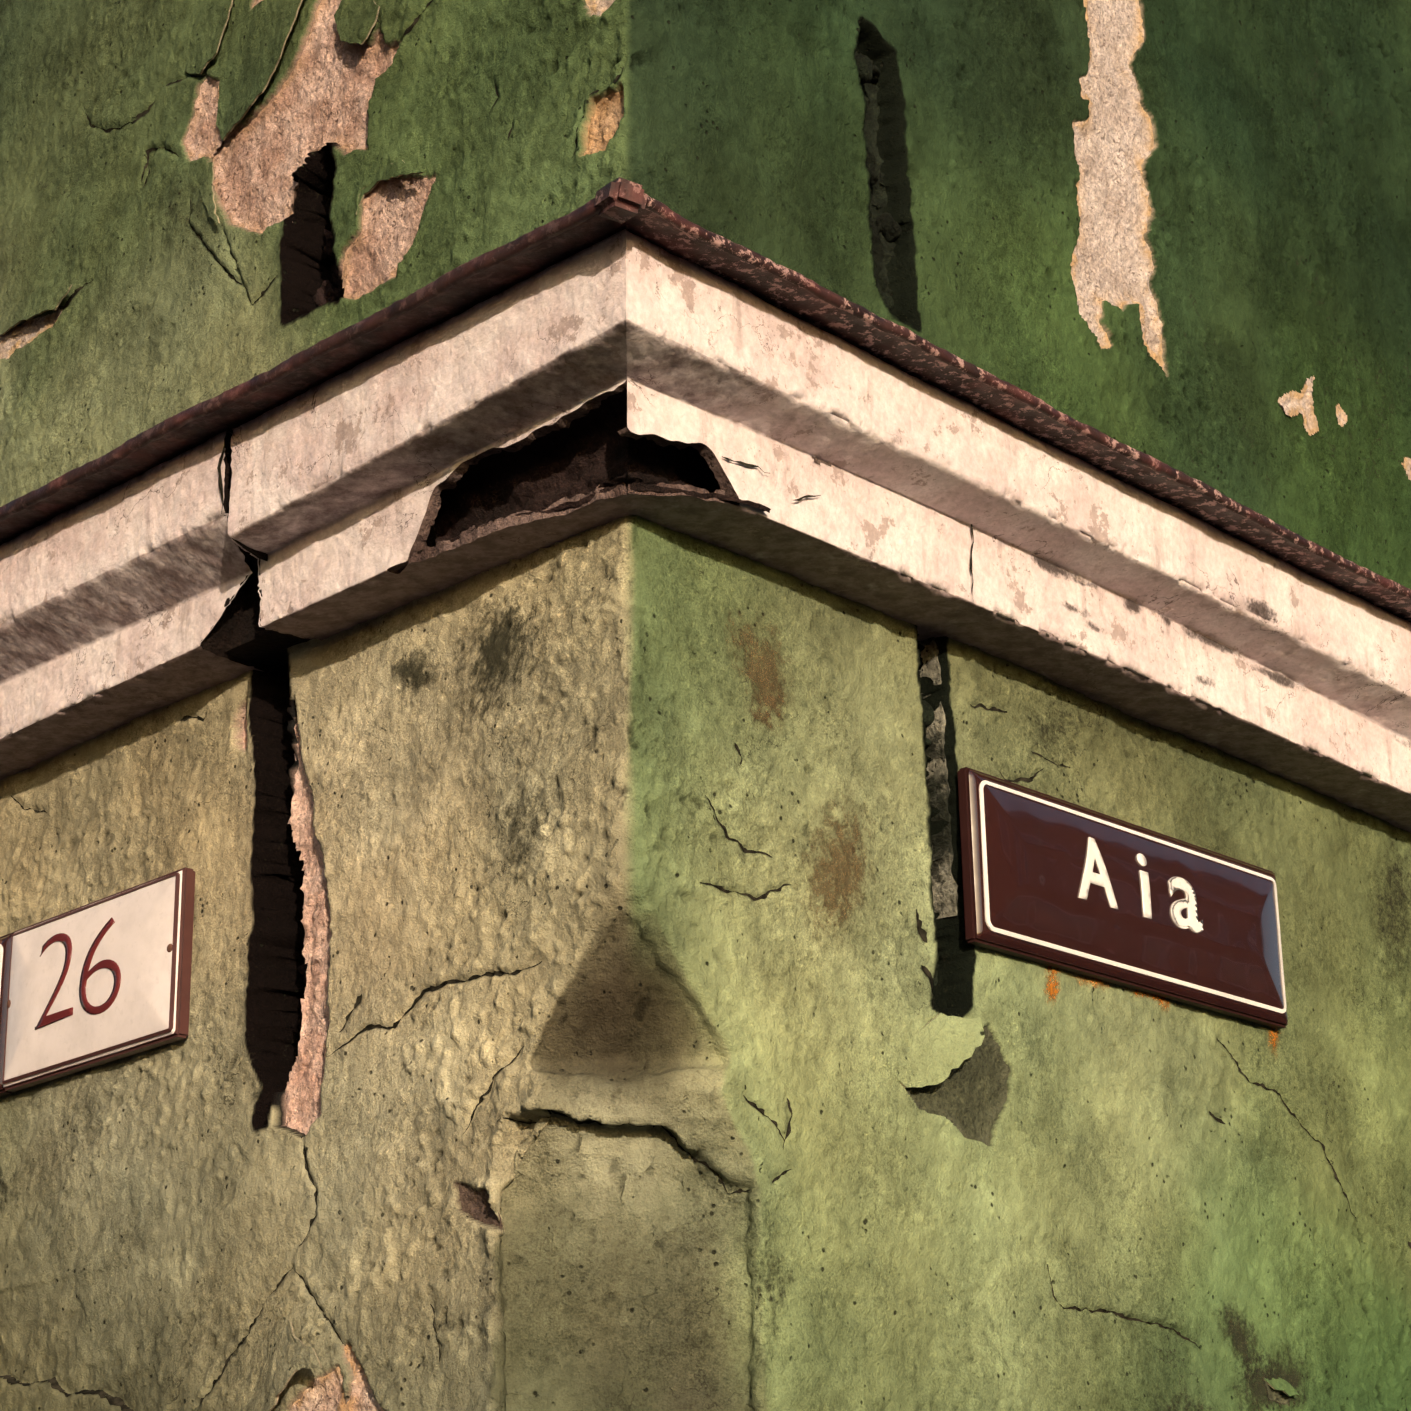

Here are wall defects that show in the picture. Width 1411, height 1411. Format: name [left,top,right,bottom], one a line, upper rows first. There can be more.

peeling [0,280,93,359]
peeling [132,0,436,305]
crack [312,229,345,306]
crack [855,51,902,310]
peeling [1070,0,1165,370]
spalling [417,389,771,554]
peeling [1278,376,1319,436]
crack [916,637,1007,992]
crack [194,719,542,1411]
crack [0,1375,134,1411]
spalling [219,1319,384,1411]
crack [1047,1264,1200,1349]